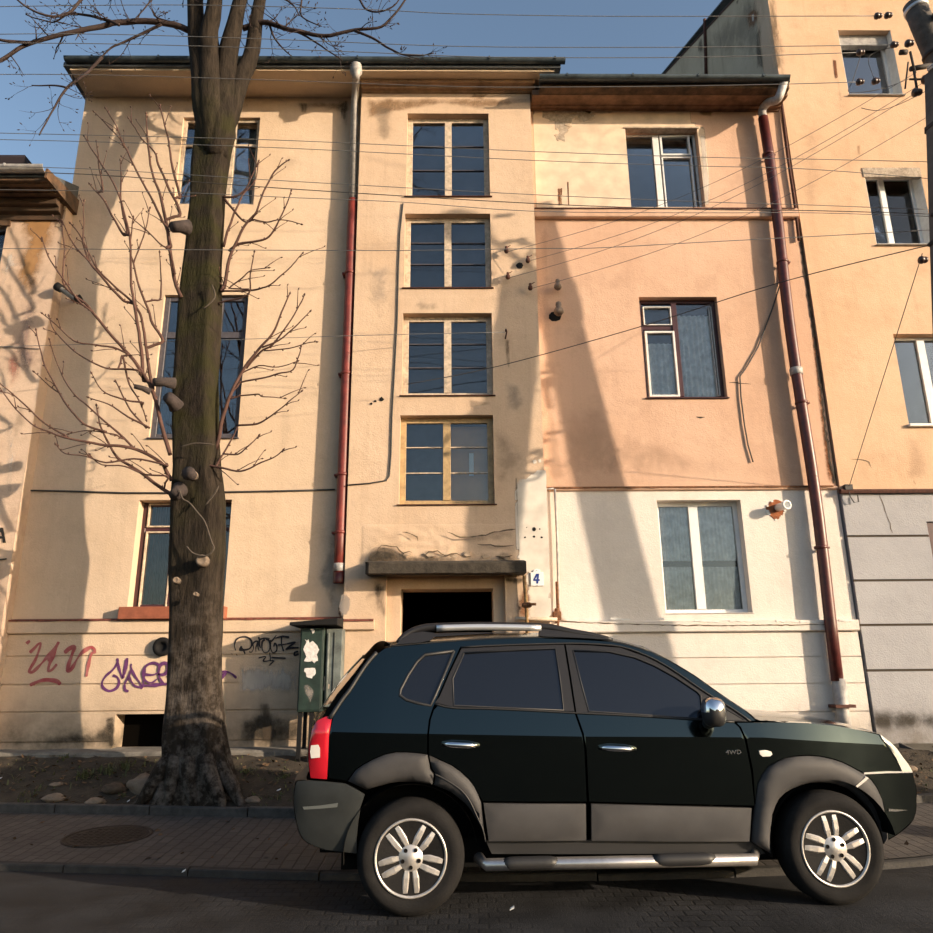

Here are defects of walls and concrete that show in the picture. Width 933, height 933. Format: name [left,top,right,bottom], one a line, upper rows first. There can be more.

leakage [371,100,435,114]
leakage [19,221,51,285]
leakage [244,705,297,740]